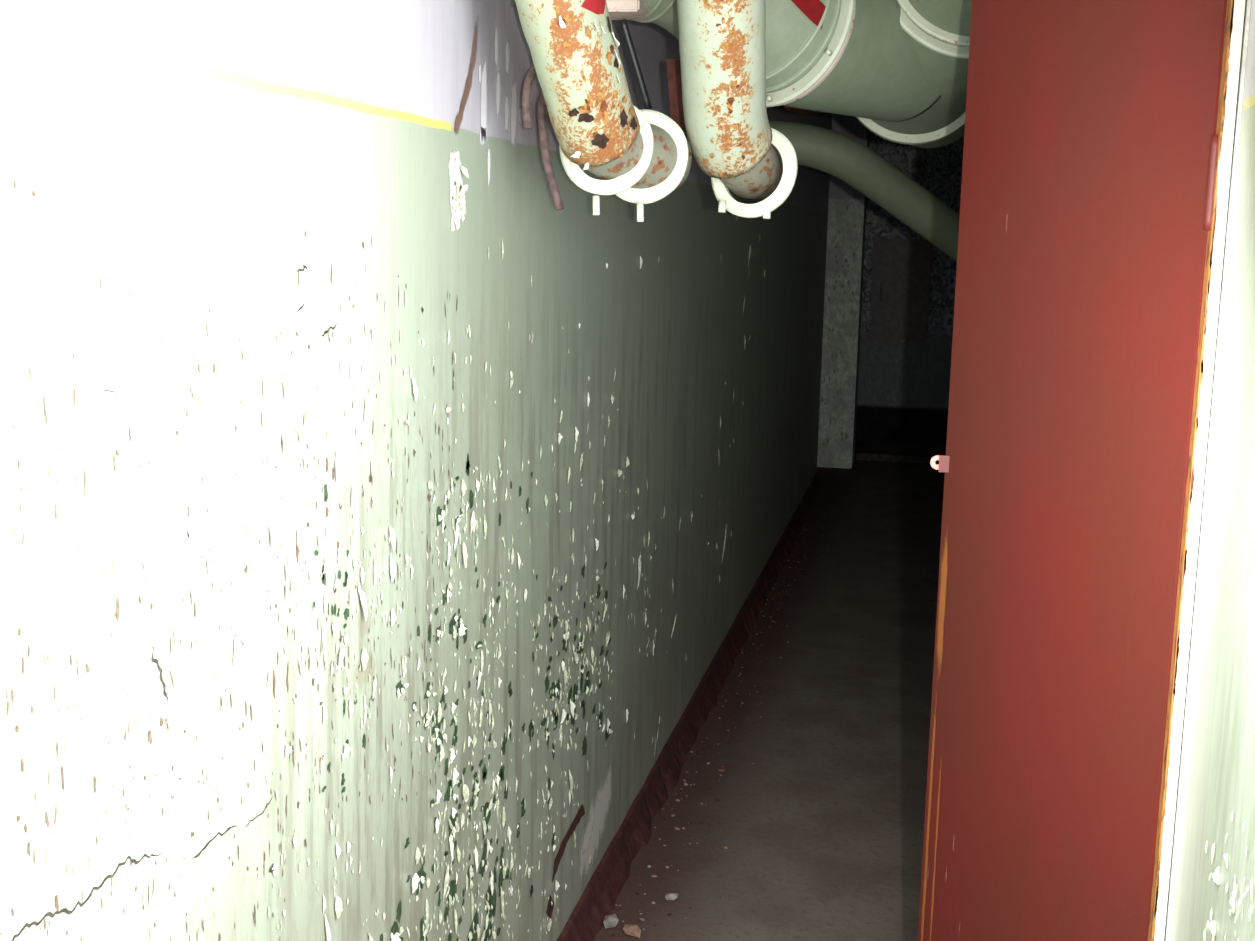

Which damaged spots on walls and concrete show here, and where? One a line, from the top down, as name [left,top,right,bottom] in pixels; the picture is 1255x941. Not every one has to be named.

peeling [340,330,491,432]
peeling [279,458,413,793]
peeling [363,369,657,941]
crack [12,853,162,941]
crack [193,797,273,858]
peeling [264,830,319,895]
peeling [315,809,361,941]
peeling [1203,810,1254,941]